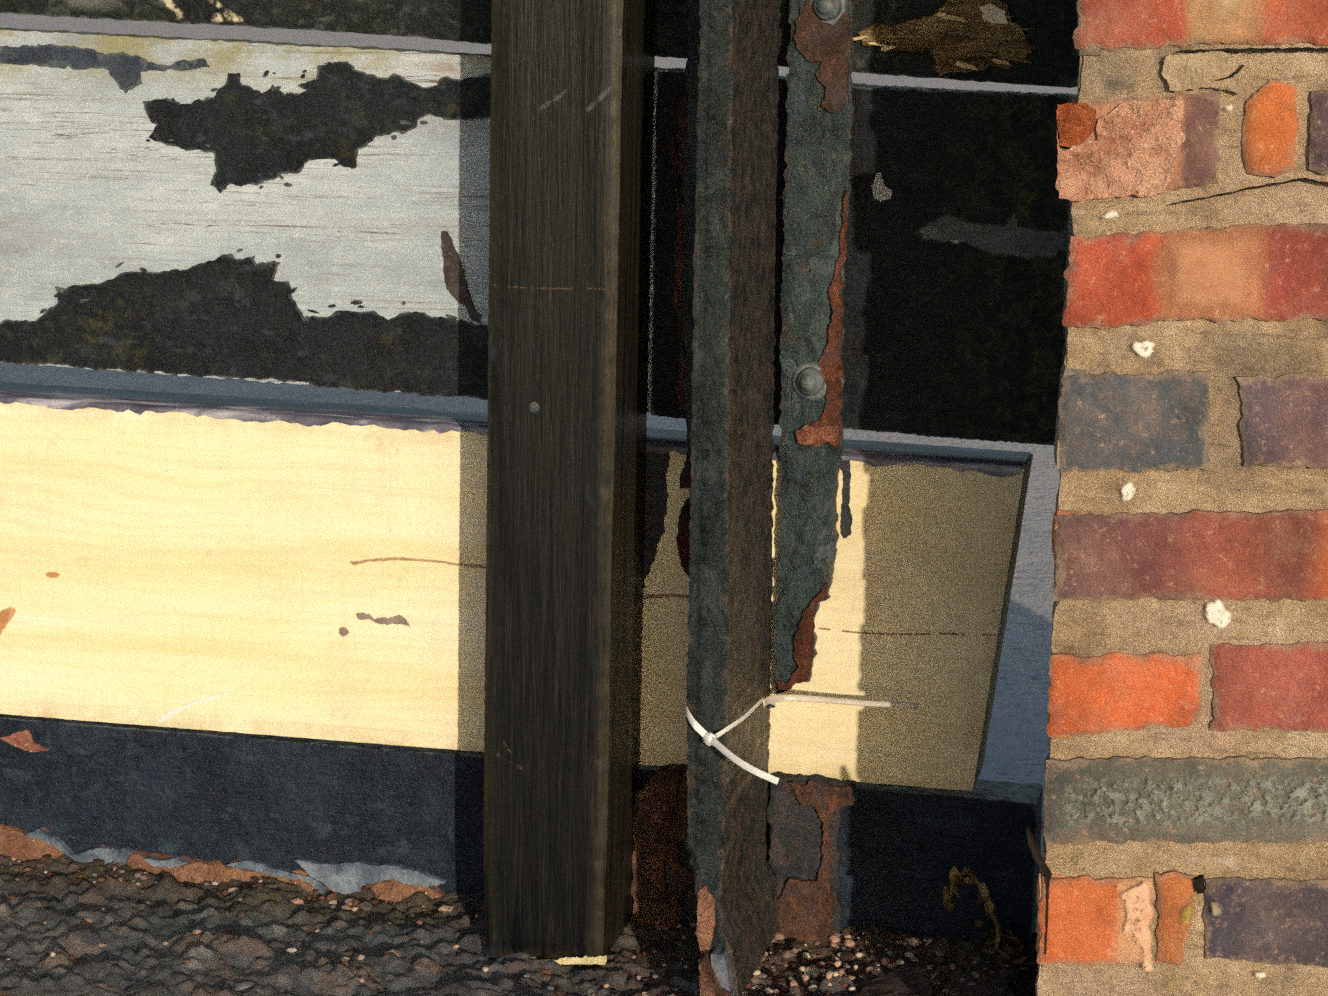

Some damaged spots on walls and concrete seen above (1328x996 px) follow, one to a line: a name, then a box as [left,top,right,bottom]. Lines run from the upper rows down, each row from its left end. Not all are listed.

peeling [0,44,491,193]
rust [794,0,852,113]
crack [1172,178,1328,205]
peeling [0,231,488,400]
rust [796,189,849,446]
rust [676,472,692,576]
peeling [0,824,485,903]
rust [631,769,716,954]
rust [777,780,854,945]
crack [1026,825,1052,962]
peeling [1117,882,1153,971]